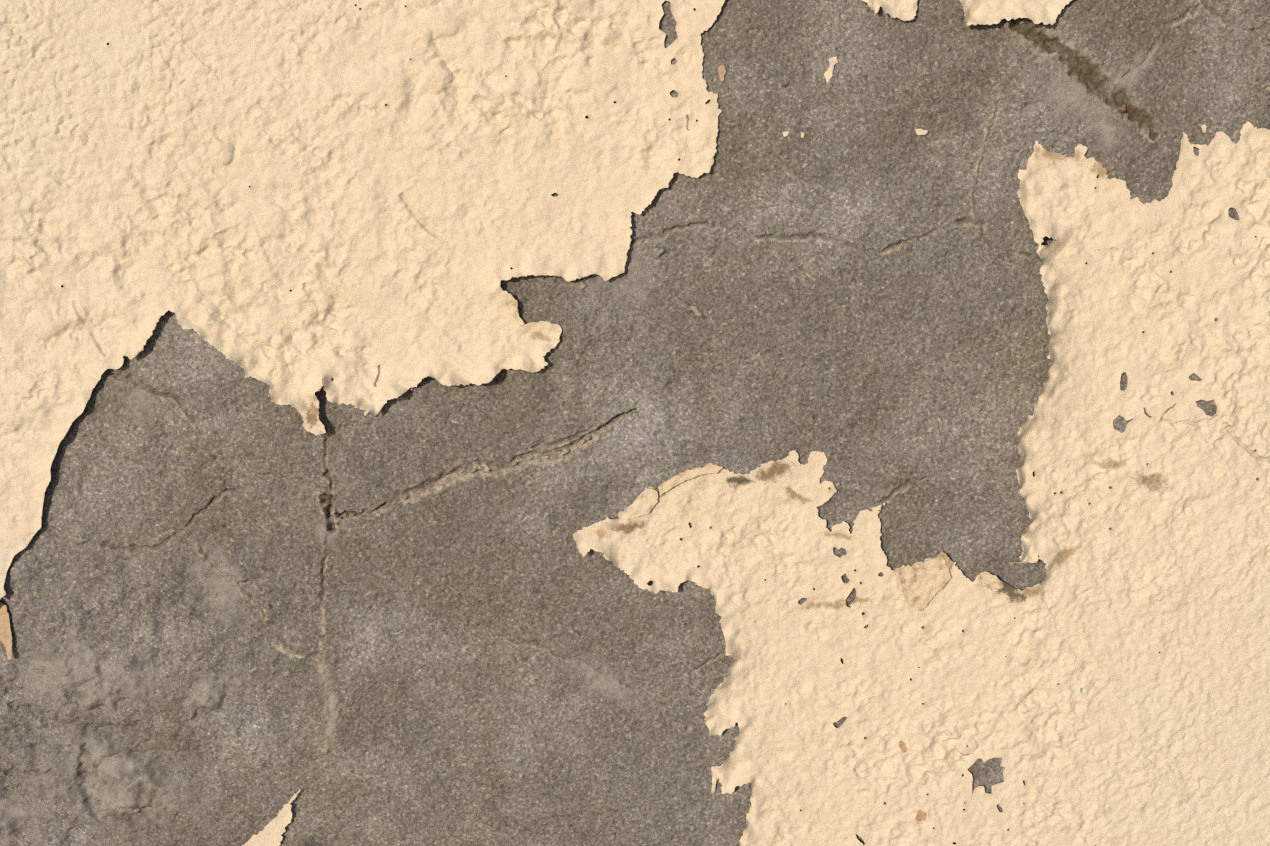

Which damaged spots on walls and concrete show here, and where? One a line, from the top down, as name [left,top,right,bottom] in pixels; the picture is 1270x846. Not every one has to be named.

crack [156,0,222,81]
peeling [659,4,678,64]
damp [1046,76,1117,147]
spalling [1004,0,1198,144]
crack [1119,0,1270,80]
crack [629,85,1035,282]
peeling [497,283,562,372]
peeling [263,378,334,436]
crack [374,364,382,389]
crack [48,369,646,778]
peeling [854,505,887,562]
spalling [0,679,201,770]